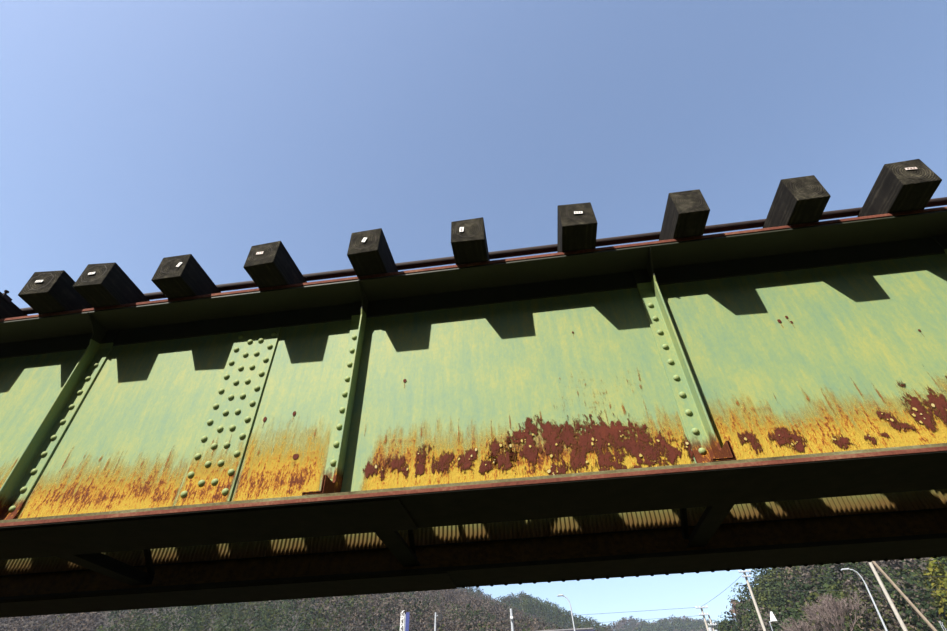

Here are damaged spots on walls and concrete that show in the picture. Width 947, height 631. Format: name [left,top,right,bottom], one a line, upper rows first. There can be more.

rust [0,430,343,520]
rust [361,380,947,491]